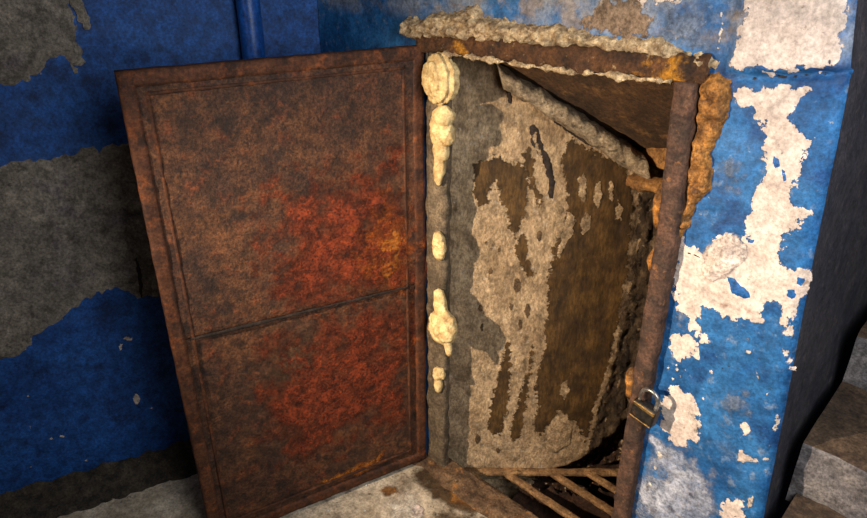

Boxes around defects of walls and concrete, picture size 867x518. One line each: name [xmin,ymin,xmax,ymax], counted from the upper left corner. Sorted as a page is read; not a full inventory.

corrosion [273,148,415,304]
leakage [471,136,634,453]
peeling [636,0,849,518]
corrosion [323,453,383,483]